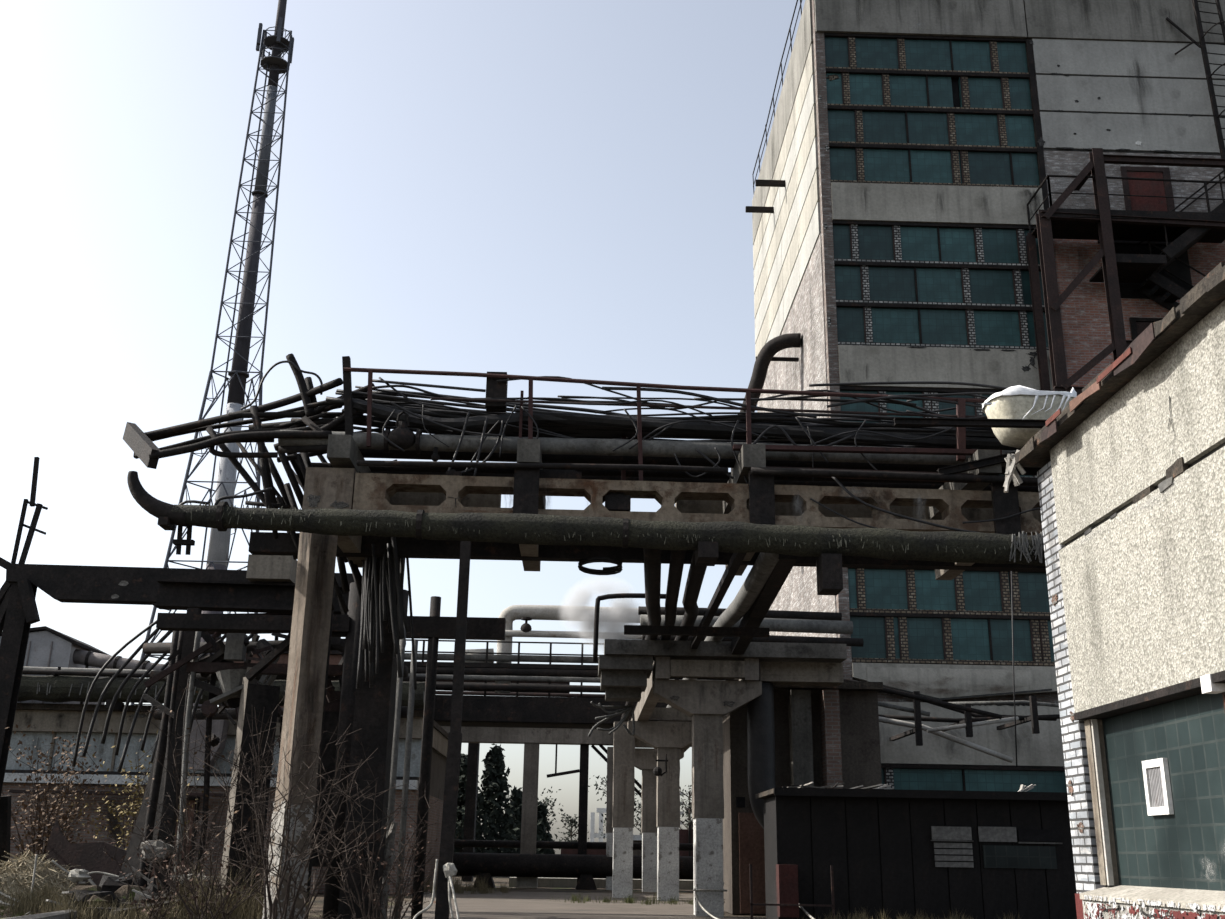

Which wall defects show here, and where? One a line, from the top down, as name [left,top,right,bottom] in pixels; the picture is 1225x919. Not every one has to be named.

peeling [1083,895,1225,919]